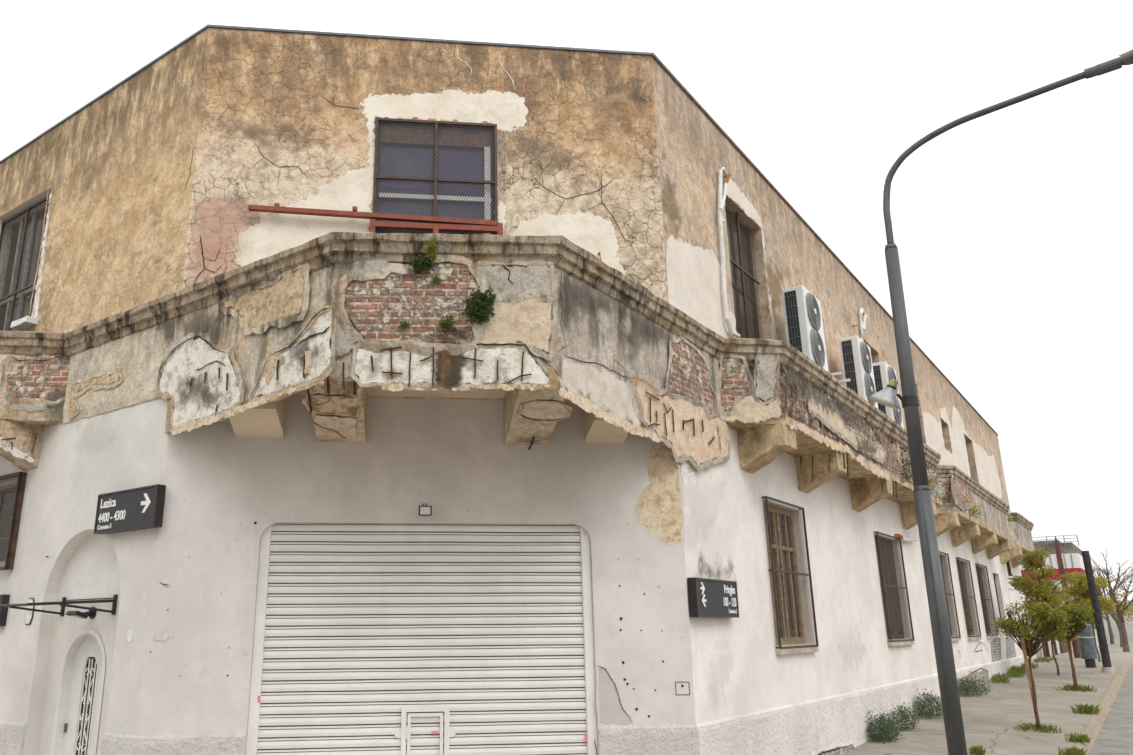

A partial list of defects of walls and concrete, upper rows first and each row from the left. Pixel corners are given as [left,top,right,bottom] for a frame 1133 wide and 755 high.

crack [251,142,307,186]
crack [534,155,637,244]
crack [194,236,223,283]
leakage [560,275,671,360]
spalling [0,354,123,462]
spalling [155,254,897,546]
leakage [787,370,877,460]
spalling [934,475,972,511]